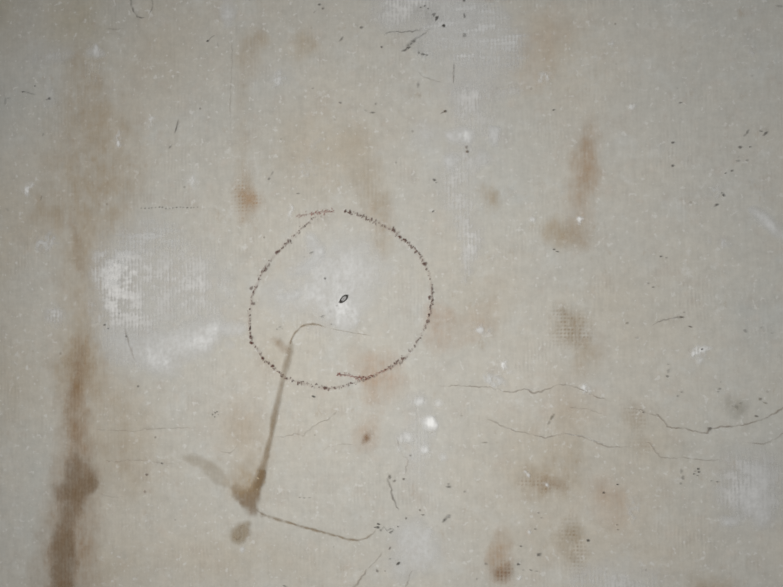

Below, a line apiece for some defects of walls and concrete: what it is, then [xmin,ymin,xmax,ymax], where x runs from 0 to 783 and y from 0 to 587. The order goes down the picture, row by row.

water stain [240,410,276,508]